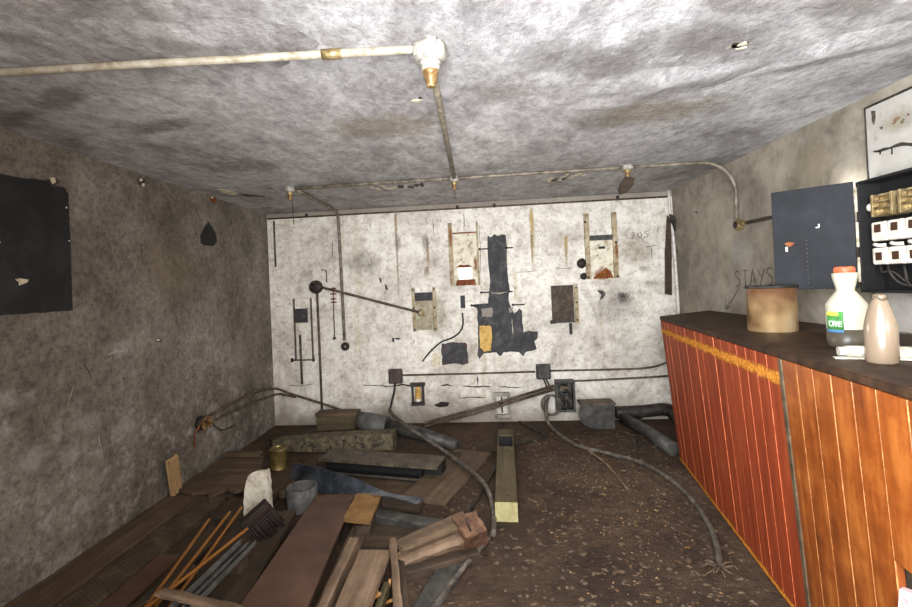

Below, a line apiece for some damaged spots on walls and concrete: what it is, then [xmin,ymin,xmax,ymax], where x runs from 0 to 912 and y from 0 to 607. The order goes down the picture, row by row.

peeling [441,234,538,366]